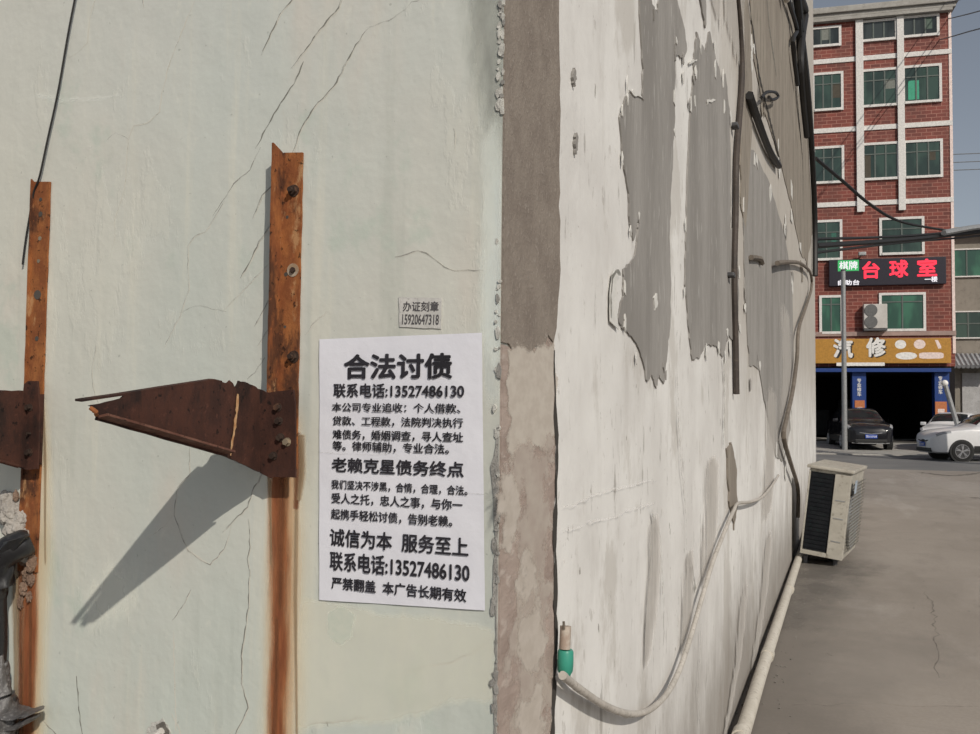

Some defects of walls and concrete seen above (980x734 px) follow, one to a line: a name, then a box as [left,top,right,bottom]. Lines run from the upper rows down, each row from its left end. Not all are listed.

crack [224,186,271,311]
crack [215,0,341,212]
crack [294,36,362,151]
crack [396,250,485,272]
peeling [489,0,577,734]
peeling [609,0,812,482]
corrosion [13,417,46,734]
spalling [146,718,171,734]
crack [149,447,263,734]
corrosion [267,432,304,734]